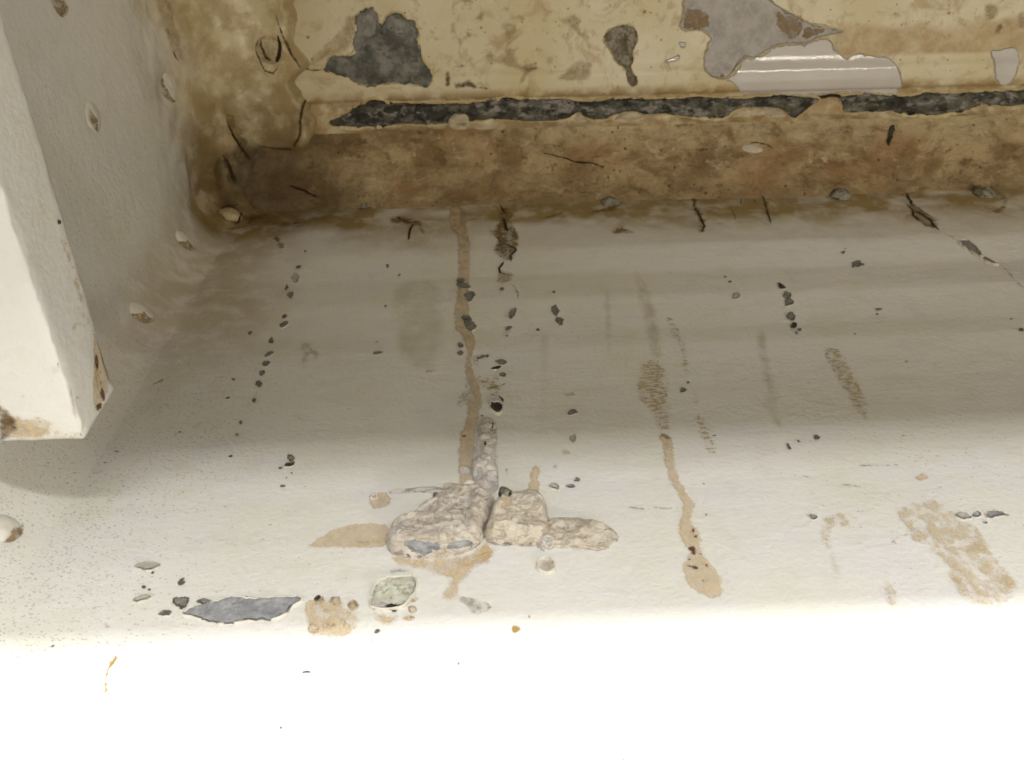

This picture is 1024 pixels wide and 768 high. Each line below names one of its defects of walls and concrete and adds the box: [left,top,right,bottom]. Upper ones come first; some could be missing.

crack [256,17,318,74]
peeling [324,6,434,88]
spalling [603,24,639,87]
peeling [664,0,903,96]
crack [819,92,841,100]
crack [221,99,306,224]
crack [290,185,318,197]
crack [906,193,1012,275]
water stain [310,207,619,558]
water stain [638,361,722,597]
peeling [157,578,304,626]
spalling [369,574,418,633]